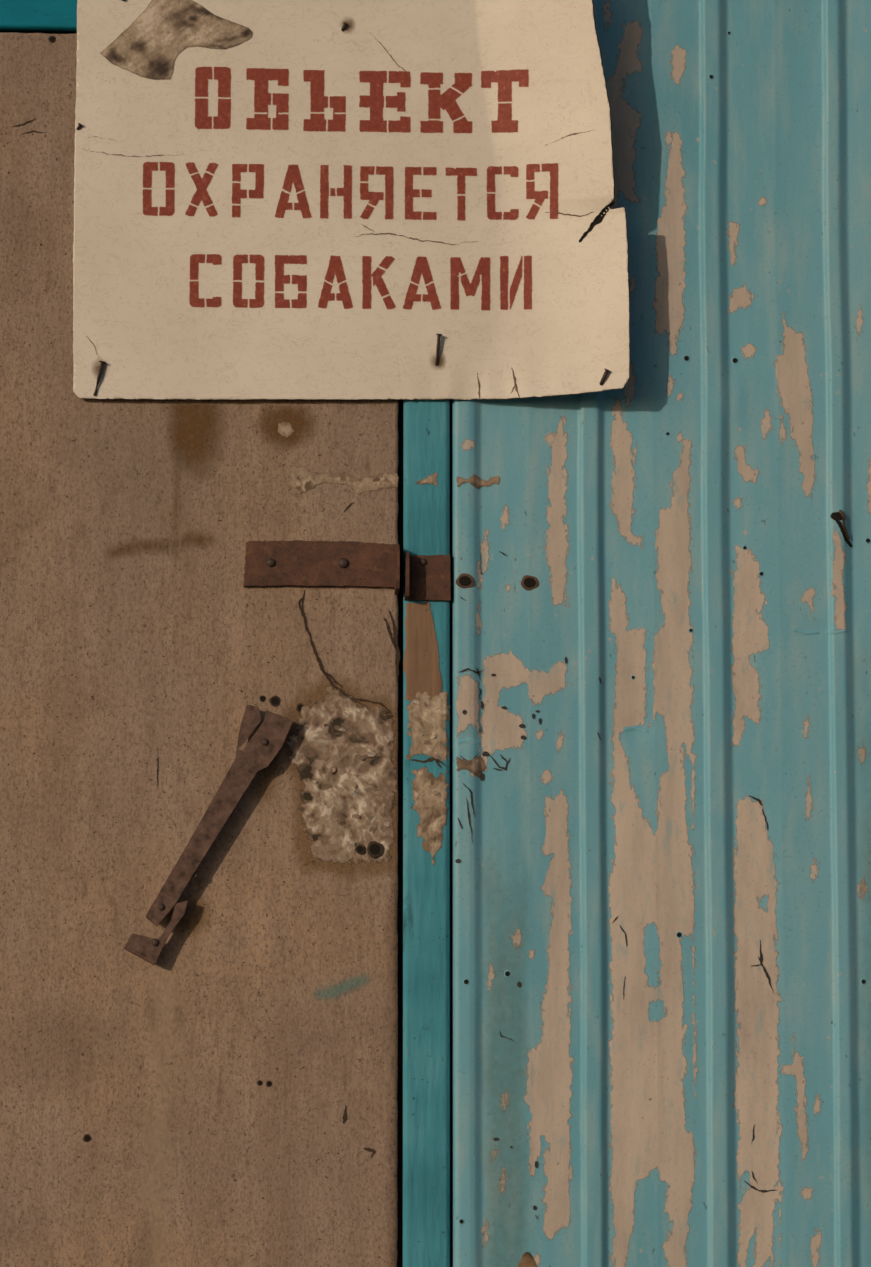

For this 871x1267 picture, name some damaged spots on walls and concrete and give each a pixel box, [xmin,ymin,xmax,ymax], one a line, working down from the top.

peeling [603,0,643,209]
peeling [670,45,686,85]
peeling [652,130,688,356]
peeling [288,465,399,495]
peeling [456,474,500,489]
peeling [761,312,816,497]
crack [298,590,400,714]
spalling [287,602,567,865]
peeling [608,362,698,1267]
peeling [730,545,769,747]
peeling [511,770,574,1239]
peeling [733,796,822,1267]